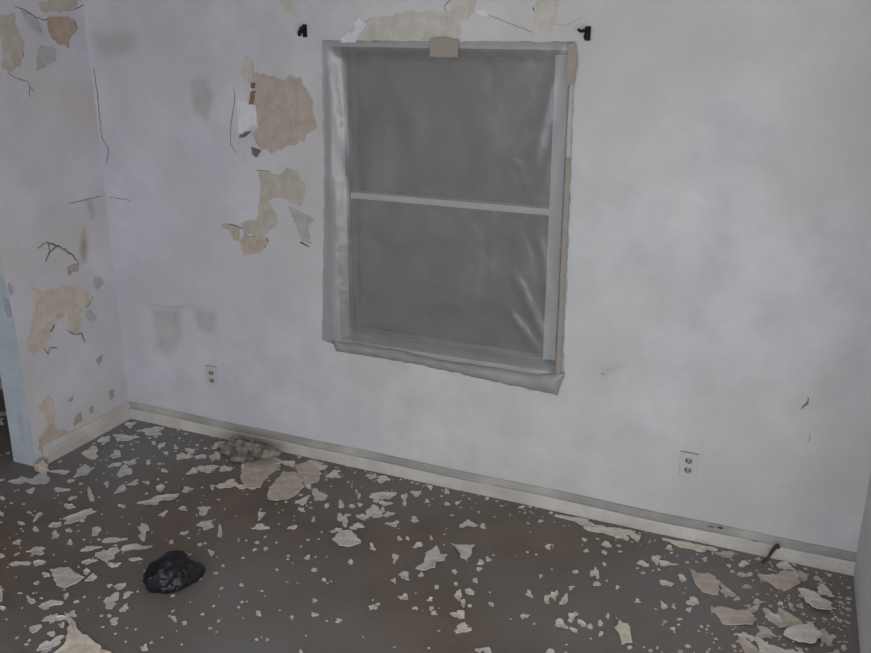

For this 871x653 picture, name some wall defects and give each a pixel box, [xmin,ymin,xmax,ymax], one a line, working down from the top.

peeling [0,0,83,73]
peeling [341,0,489,44]
peeling [236,55,317,157]
peeling [222,167,315,255]
crack [37,242,79,276]
peeling [27,277,104,355]
peeling [38,394,94,455]